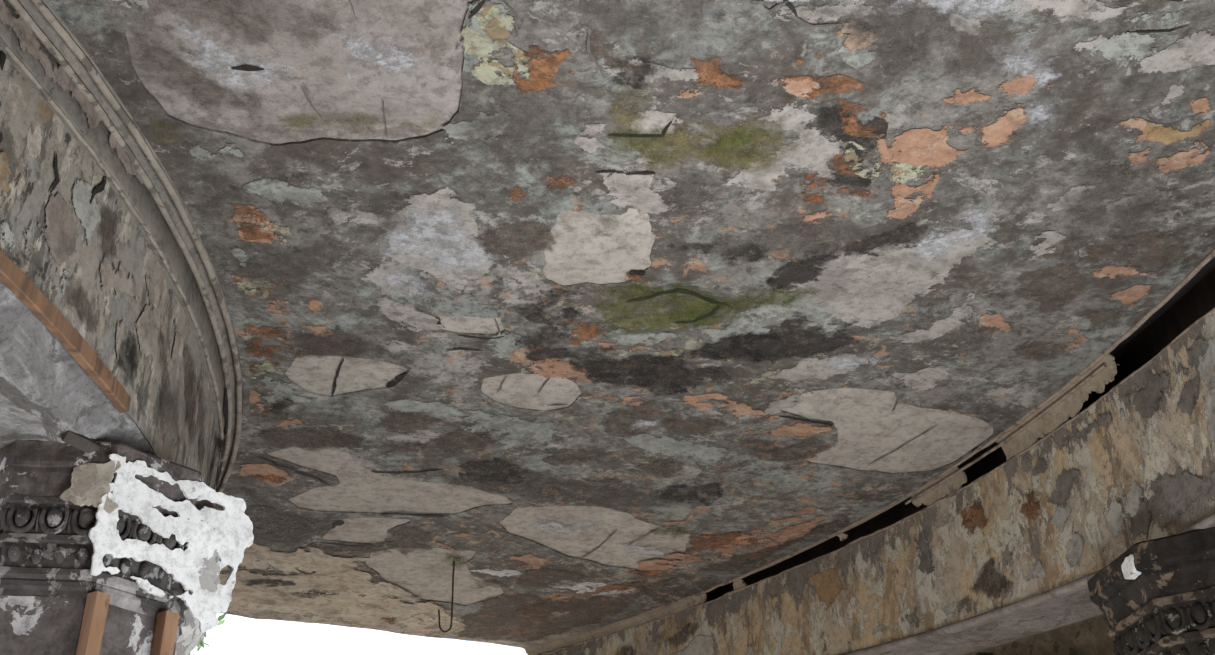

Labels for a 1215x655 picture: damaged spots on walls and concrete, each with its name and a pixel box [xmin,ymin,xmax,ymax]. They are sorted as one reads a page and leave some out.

crack [468,1,519,38]
damp [584,9,783,169]
crack [763,0,843,27]
damp [822,0,1055,86]
damp [1028,106,1049,122]
spalling [543,150,669,286]
peeling [242,177,582,449]
damp [515,288,876,437]
peeling [693,229,1013,349]
spalling [763,353,993,473]
spalling [257,447,690,605]
spalling [1121,555,1141,580]